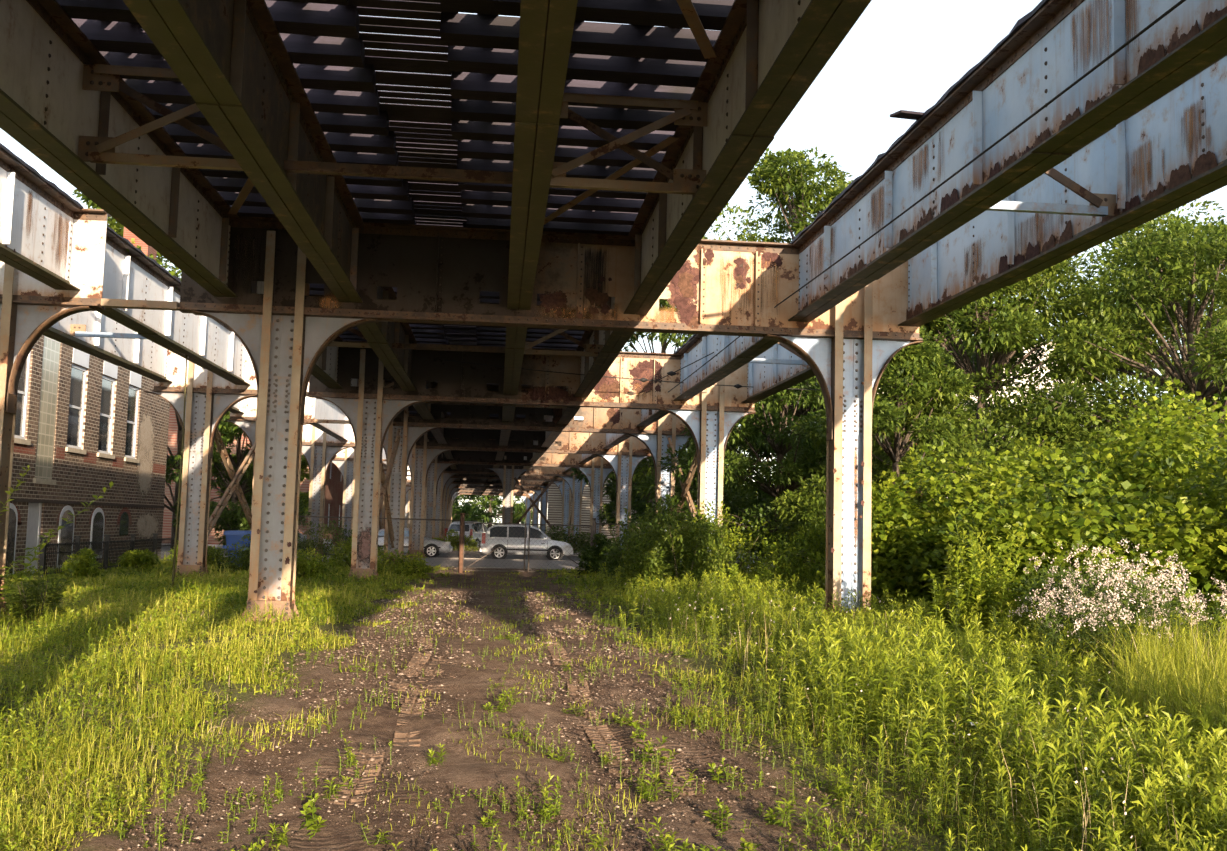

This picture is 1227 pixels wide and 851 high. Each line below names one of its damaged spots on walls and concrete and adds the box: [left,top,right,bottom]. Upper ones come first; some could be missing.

corrosion [899,95,1106,242]
corrosion [1101,104,1218,223]
corrosion [53,217,68,264]
corrosion [965,242,982,277]
corrosion [998,213,1073,275]
corrosion [657,308,674,323]
corrosion [722,260,779,320]
corrosion [906,295,951,320]